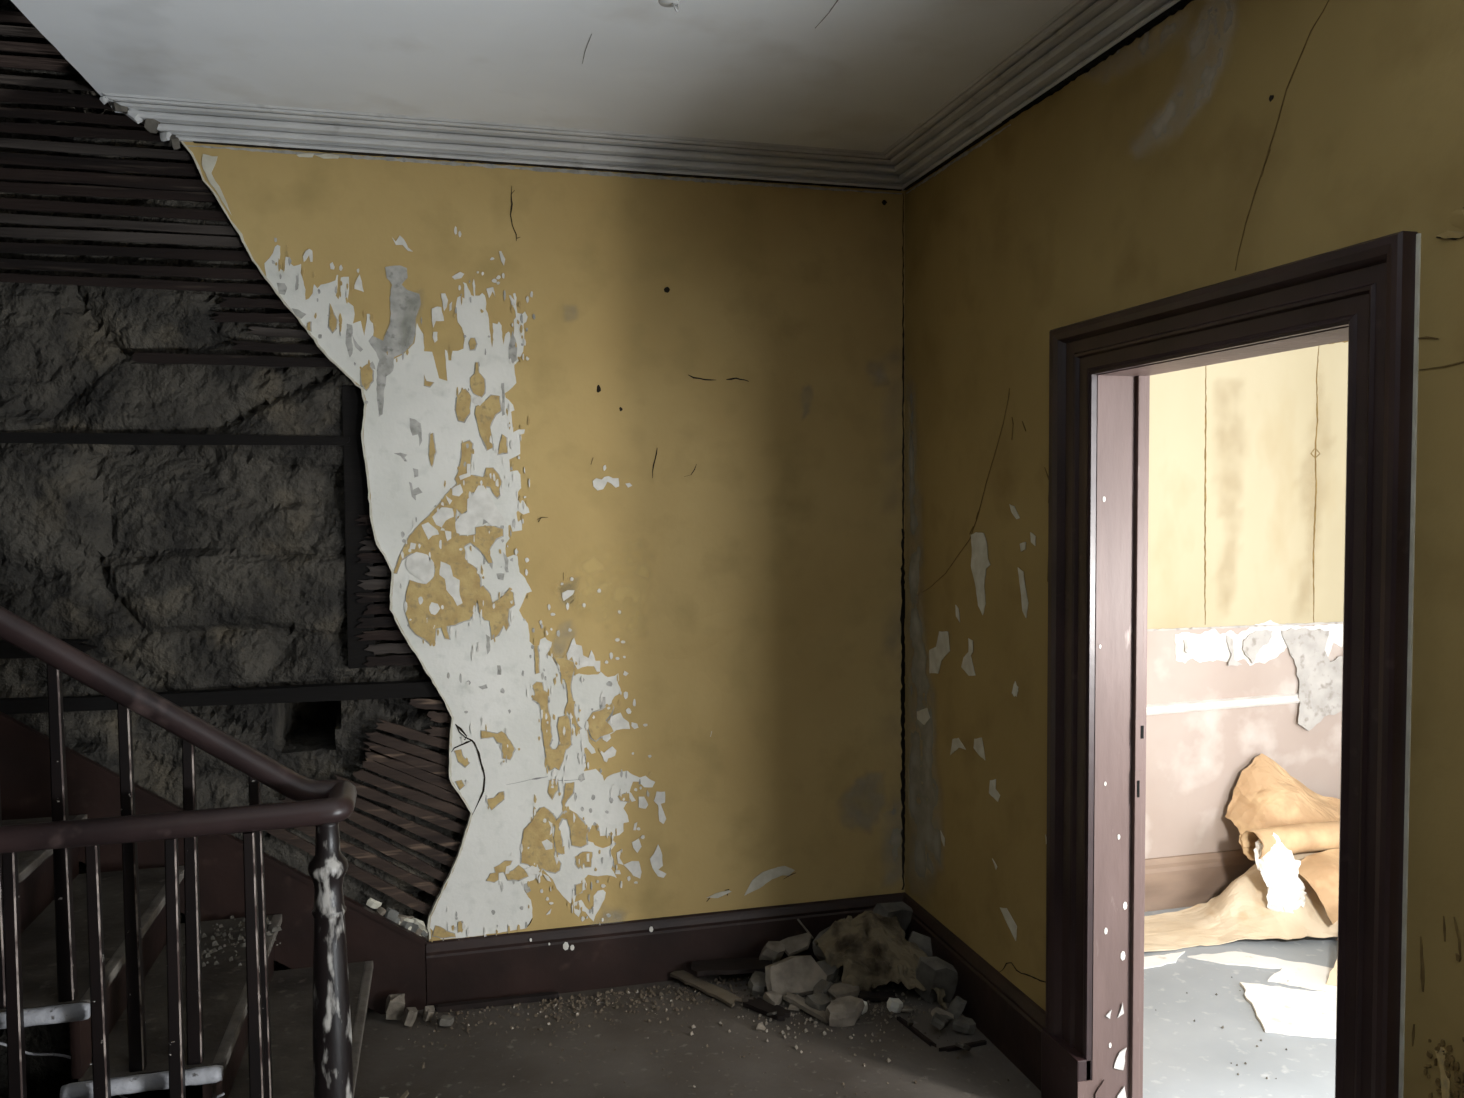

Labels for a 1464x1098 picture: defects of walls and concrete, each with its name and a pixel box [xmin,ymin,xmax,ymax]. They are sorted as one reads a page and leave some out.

crack [1235,0,1329,271]
peeling [100,96,666,950]
crack [193,0,1194,890]
peeling [971,532,990,615]
peeling [1009,504,1036,617]
crack [1201,366,1209,625]
crack [1310,341,1348,621]
peeling [929,605,975,676]
peeling [950,738,985,760]
peeling [1000,908,1017,941]
peeling [1077,1043,1127,1098]
flaking render [1423,1037,1464,1098]